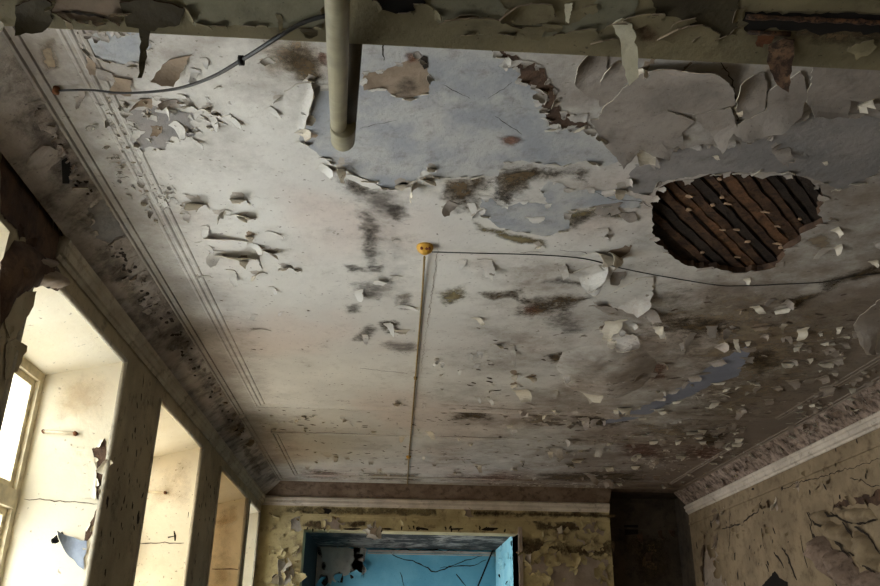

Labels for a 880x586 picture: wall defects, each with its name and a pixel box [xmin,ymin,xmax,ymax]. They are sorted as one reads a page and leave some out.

water stain [267,41,326,80]
peeling [15,0,325,295]
peeling [265,0,880,250]
water stain [348,180,399,257]
water stain [444,168,558,209]
water stain [475,223,544,244]
water stain [483,289,588,331]
peeling [412,298,880,491]
peeling [51,438,144,570]
peeling [263,507,506,586]
crack [722,499,880,580]
crack [782,458,879,489]